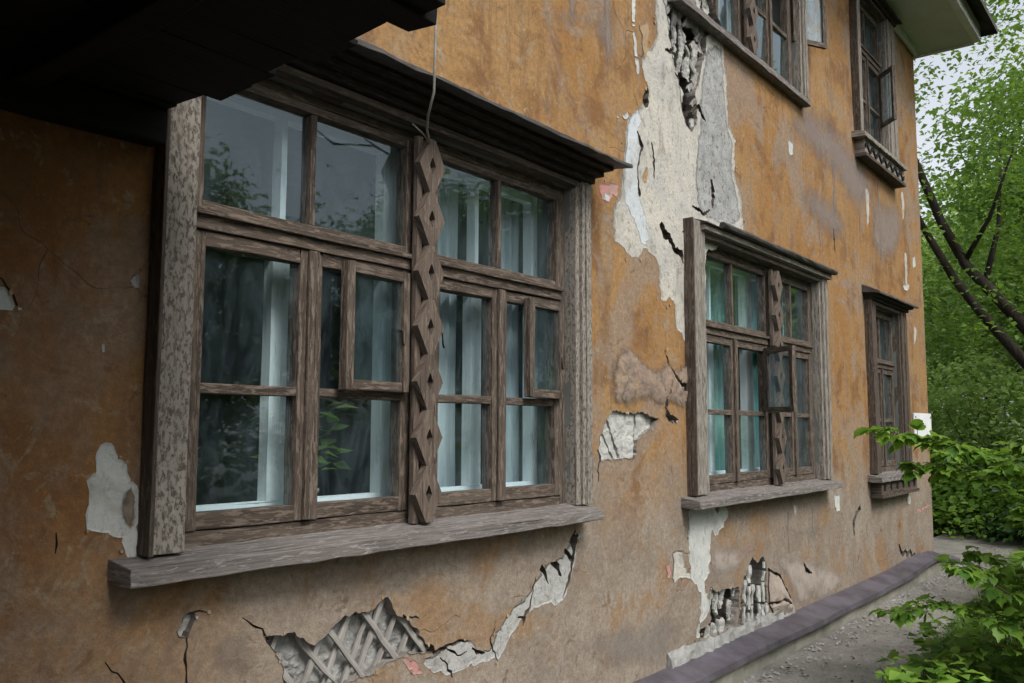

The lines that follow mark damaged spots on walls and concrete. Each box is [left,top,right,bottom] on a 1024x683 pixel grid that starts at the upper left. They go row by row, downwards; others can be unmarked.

peeling [599,0,746,341]
peeling [0,286,22,311]
crack [659,222,684,264]
spalling [597,406,679,462]
peeling [86,442,139,557]
crack [182,610,207,683]
spalling [264,532,581,683]
peeling [666,506,841,642]